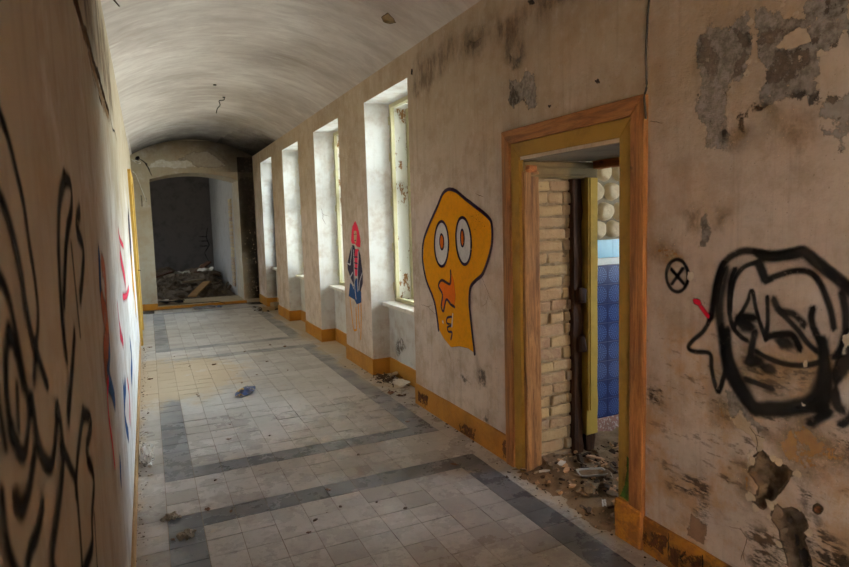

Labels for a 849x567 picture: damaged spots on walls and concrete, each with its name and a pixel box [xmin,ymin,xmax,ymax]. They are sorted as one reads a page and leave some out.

flaking render [381,13,396,24]
peeling [507,68,537,109]
peeling [694,0,849,153]
peeling [697,208,711,248]
water stain [669,474,709,516]
flaking render [725,390,824,567]
water stain [746,527,788,567]
water stain [807,530,849,567]